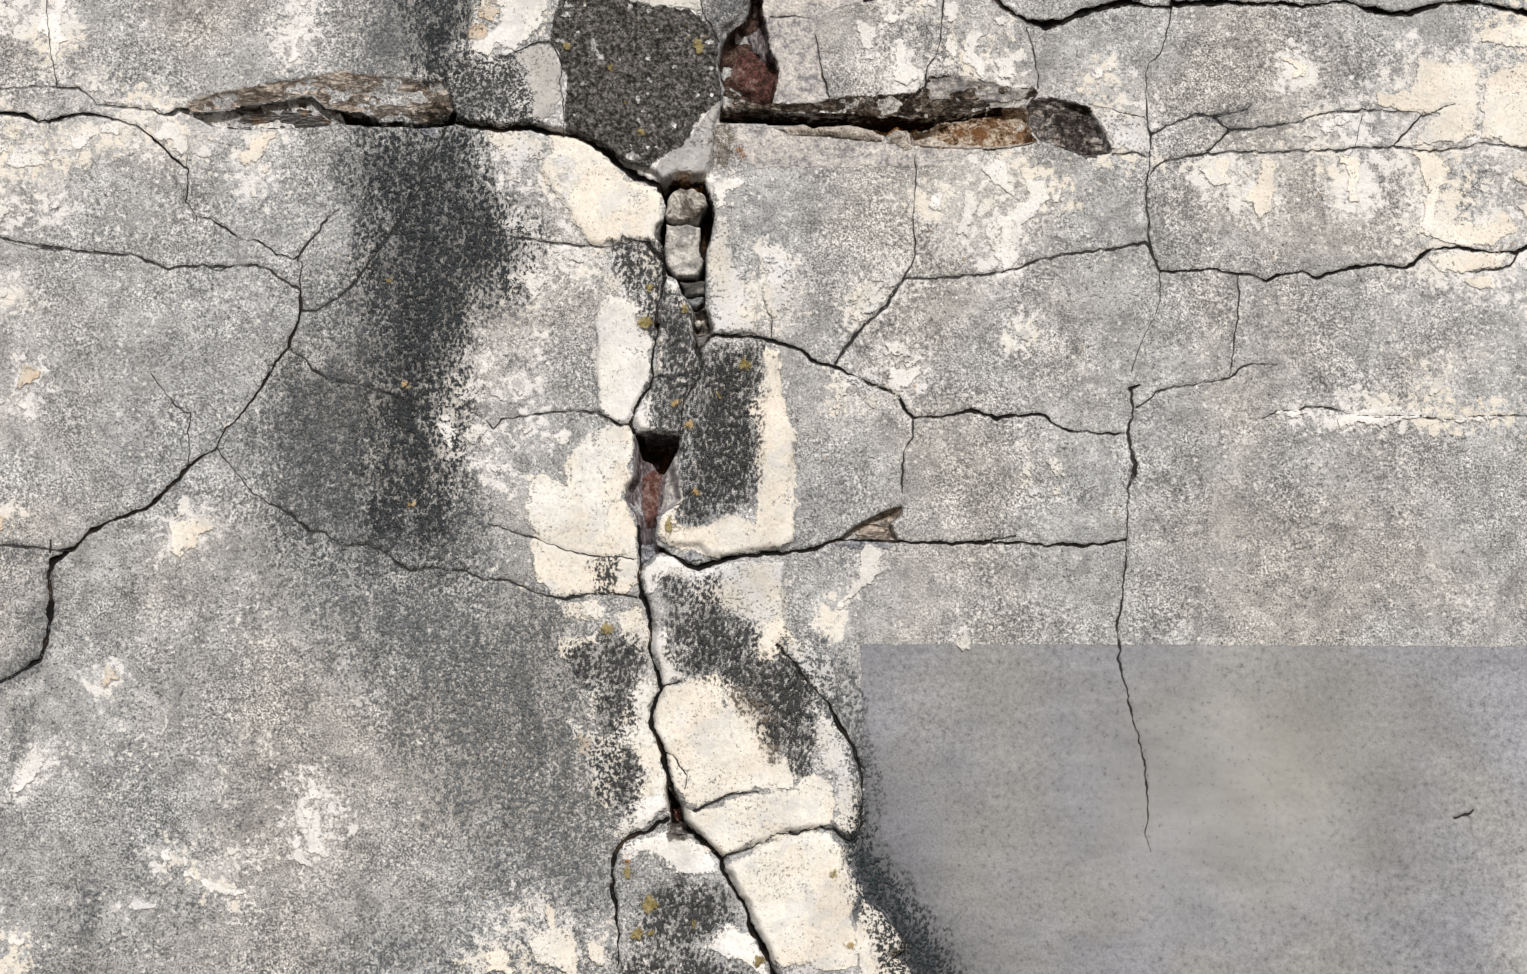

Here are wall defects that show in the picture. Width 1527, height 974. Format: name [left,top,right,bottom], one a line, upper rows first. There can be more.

water stain [350,0,485,90]
peeling [0,127,57,168]
peeling [69,123,123,152]
spalling [88,28,457,197]
spalling [466,0,1151,272]
peeling [496,269,554,303]
spalling [692,308,713,348]
crack [0,0,866,974]
water stain [209,108,967,974]
spalling [625,433,685,564]
spalling [685,549,704,561]
crack [659,0,1527,851]